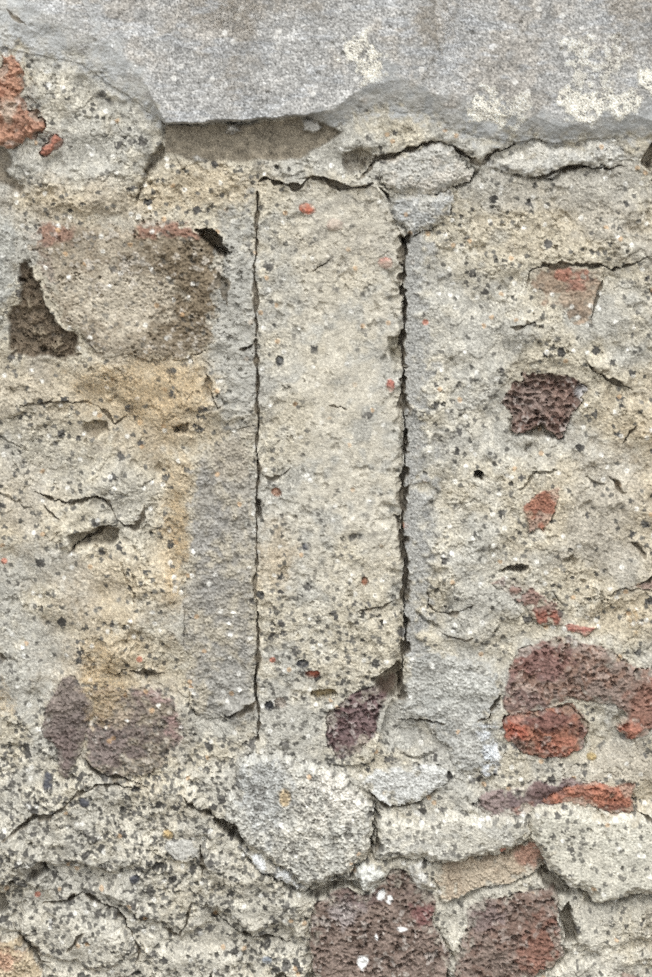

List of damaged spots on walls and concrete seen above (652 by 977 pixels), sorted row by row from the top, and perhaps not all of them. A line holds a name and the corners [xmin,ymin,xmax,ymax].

peeling [467,84,530,132]
peeling [557,68,652,128]
spalling [0,146,26,198]
spalling [135,117,344,201]
crack [258,140,518,192]
crack [526,163,627,180]
spalling [7,259,82,363]
crack [527,256,652,324]
spalling [370,660,403,701]
crack [2,759,149,843]
crack [14,927,85,964]
crack [43,891,142,965]